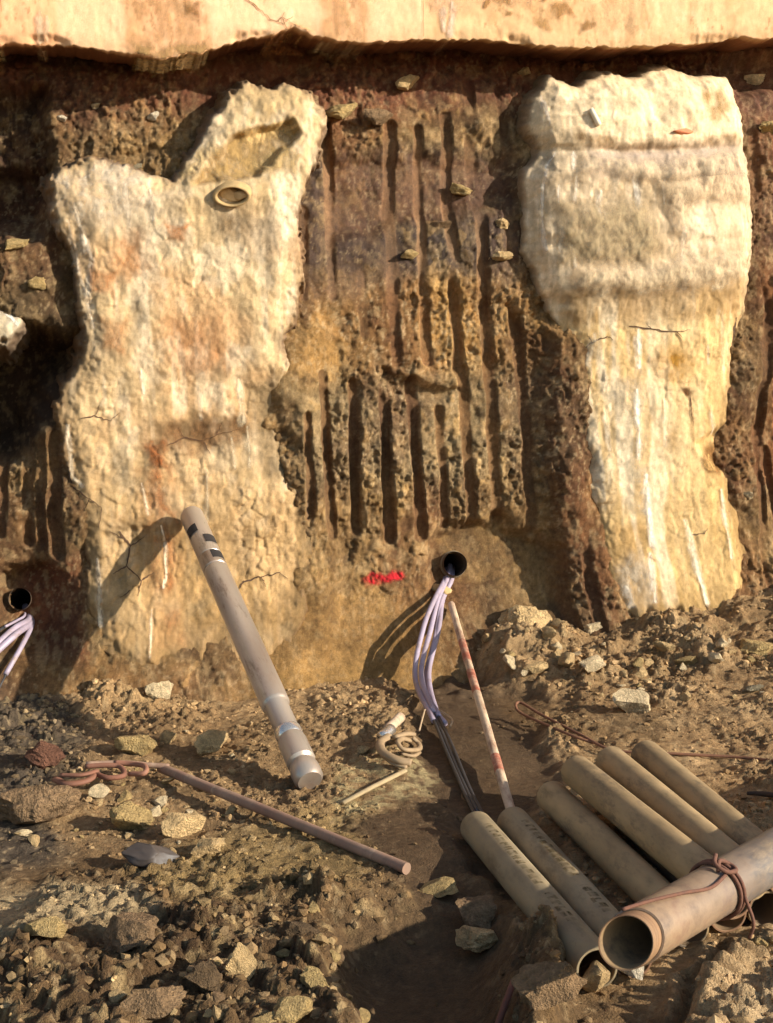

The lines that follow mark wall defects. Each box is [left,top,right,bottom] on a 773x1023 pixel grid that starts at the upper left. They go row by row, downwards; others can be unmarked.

crack [168,423,239,453]
crack [67,466,154,597]
crack [239,572,285,589]